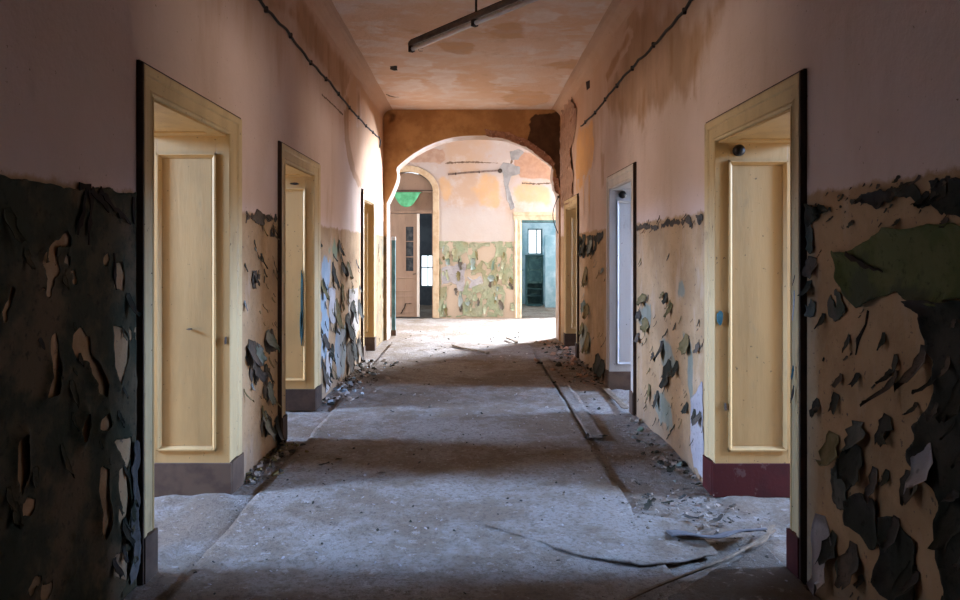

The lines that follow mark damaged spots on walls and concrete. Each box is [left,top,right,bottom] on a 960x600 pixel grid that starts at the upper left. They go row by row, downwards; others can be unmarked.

peeling [0,174,142,600]
peeling [245,209,280,240]
peeling [244,240,286,445]
peeling [321,234,387,392]
water stain [339,3,589,215]
peeling [438,241,515,317]
spalling [484,97,595,219]
peeling [577,231,606,378]
water stain [599,0,733,199]
peeling [632,274,704,478]
peeling [636,214,703,233]
peeling [792,175,960,600]